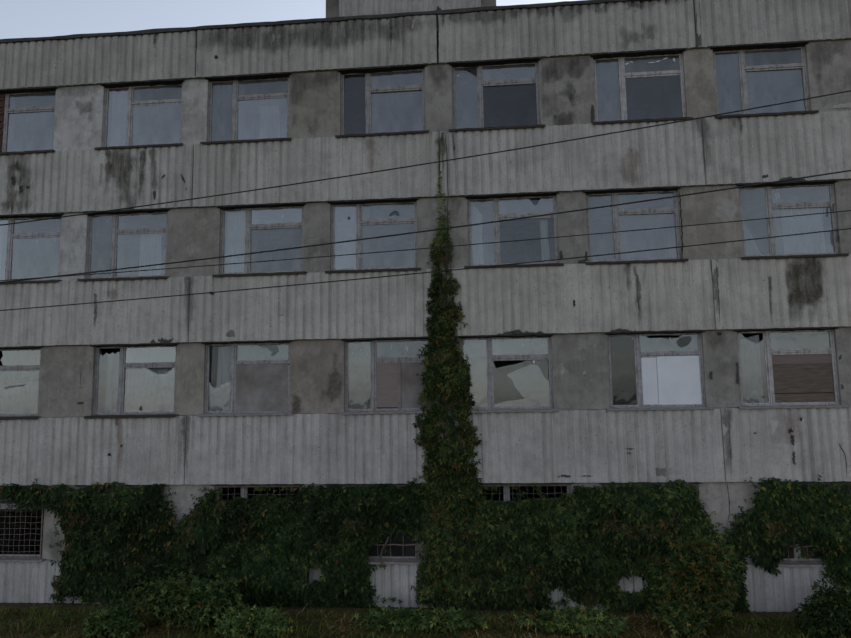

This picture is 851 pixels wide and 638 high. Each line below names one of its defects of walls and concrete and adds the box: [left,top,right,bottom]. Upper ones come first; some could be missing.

water stain [106,151,154,190]
water stain [788,259,822,303]